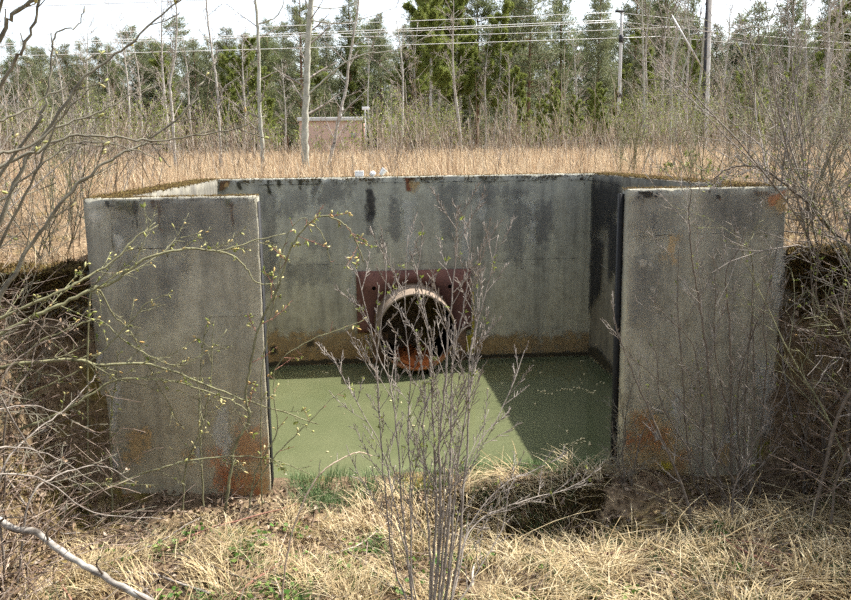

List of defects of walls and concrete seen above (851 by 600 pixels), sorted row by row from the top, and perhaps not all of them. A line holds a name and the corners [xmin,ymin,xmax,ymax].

water stain [365,188,375,222]
rust [405,178,419,191]
water stain [588,180,619,310]
water stain [267,328,373,366]
rust [208,423,270,497]
rust [626,404,691,476]